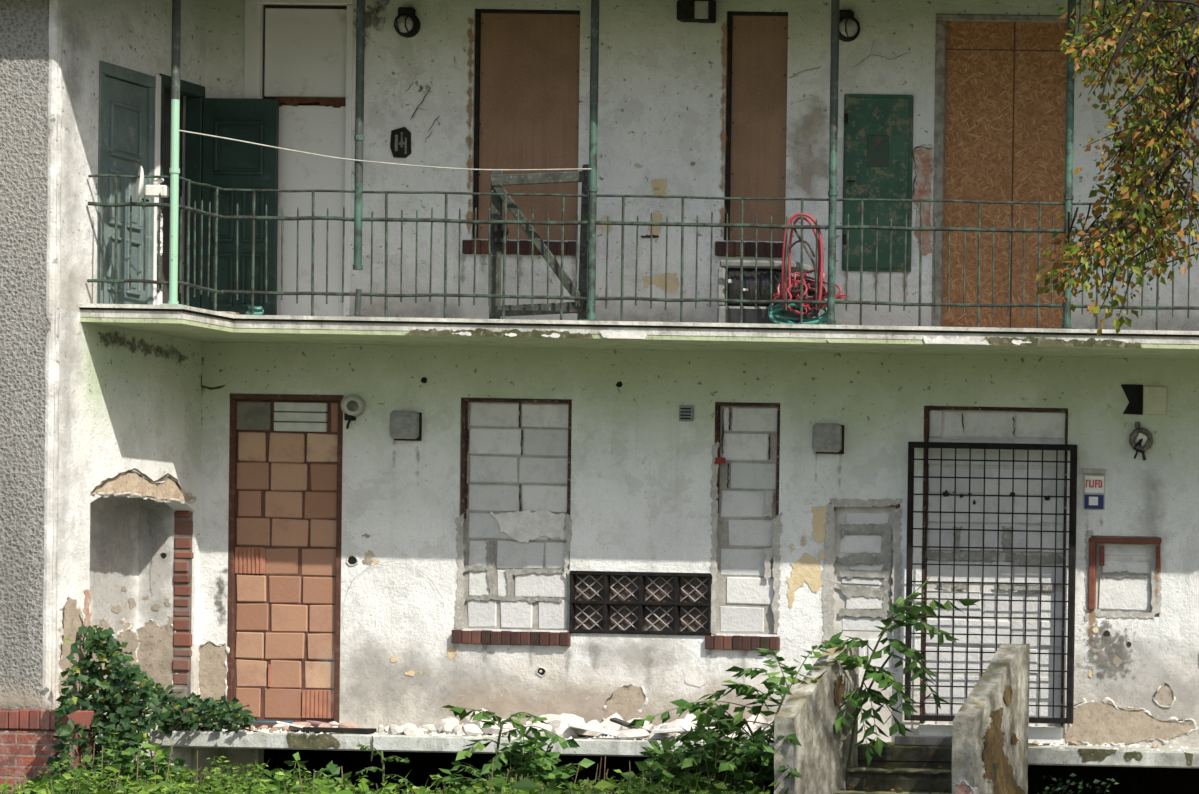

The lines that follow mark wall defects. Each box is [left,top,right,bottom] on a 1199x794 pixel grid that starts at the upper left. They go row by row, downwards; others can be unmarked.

spalling [912,144,934,256]
damp [98,331,204,365]
spalling [90,469,197,504]
peeling [786,506,827,608]
flaking render [56,586,178,706]
spalling [198,640,230,702]
spalling [602,683,648,722]
flaking render [954,685,1026,794]
spalling [1063,683,1198,746]